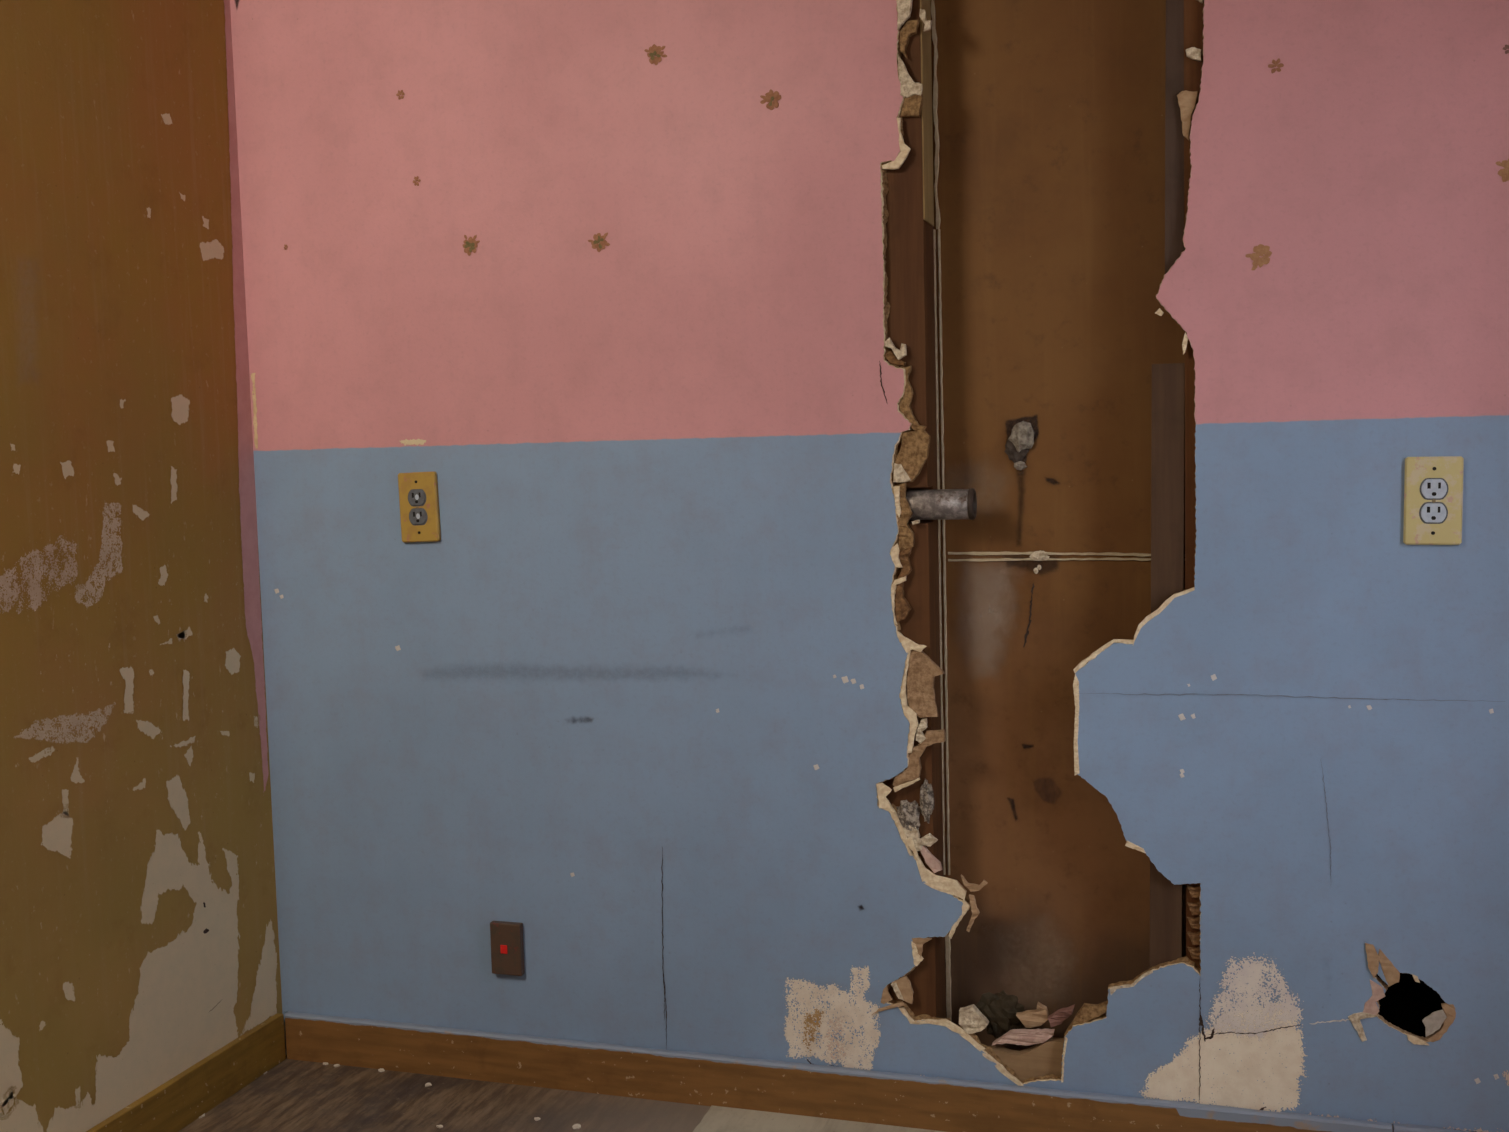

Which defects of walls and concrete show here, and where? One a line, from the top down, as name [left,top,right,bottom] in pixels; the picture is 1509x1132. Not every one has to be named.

peeling [200,216,224,261]
peeling [60,460,74,479]
peeling [170,466,178,504]
peeling [0,473,150,614]
spalling [872,0,1205,1086]
peeling [158,564,168,586]
peeling [153,615,193,645]
peeling [225,648,241,675]
peeling [0,667,277,1132]
spalling [1348,943,1456,1045]